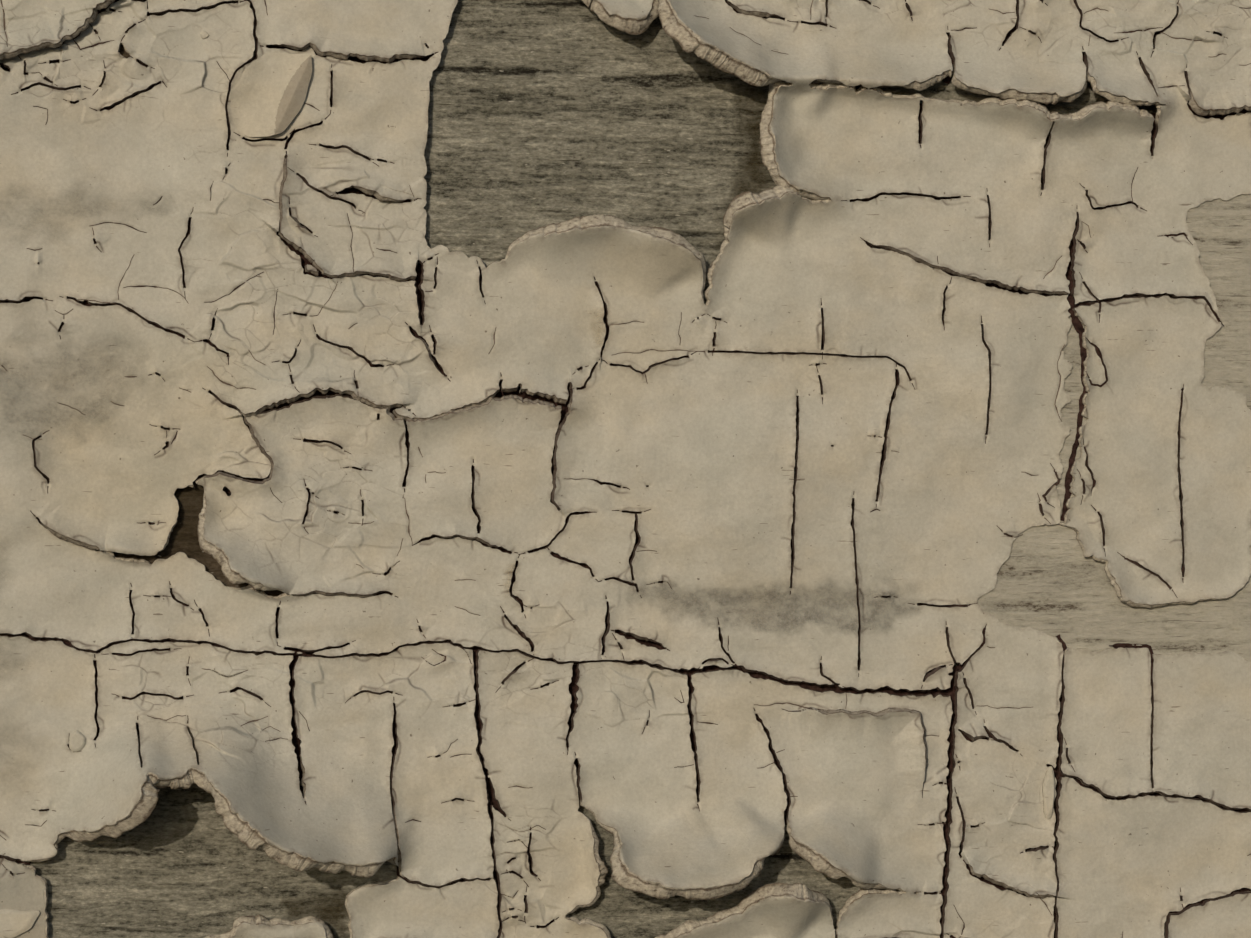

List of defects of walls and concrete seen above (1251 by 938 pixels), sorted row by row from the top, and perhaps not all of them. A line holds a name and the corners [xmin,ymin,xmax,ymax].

crack [0,0,450,533]
crack [694,0,835,54]
peeling [424,0,1165,374]
crack [841,191,990,247]
crack [916,103,924,148]
crack [918,0,1251,597]
peeling [1186,194,1251,410]
peeling [53,479,316,596]
crack [0,261,1251,938]
peeling [977,316,1251,662]
peeling [0,756,491,938]
peeling [531,723,920,938]